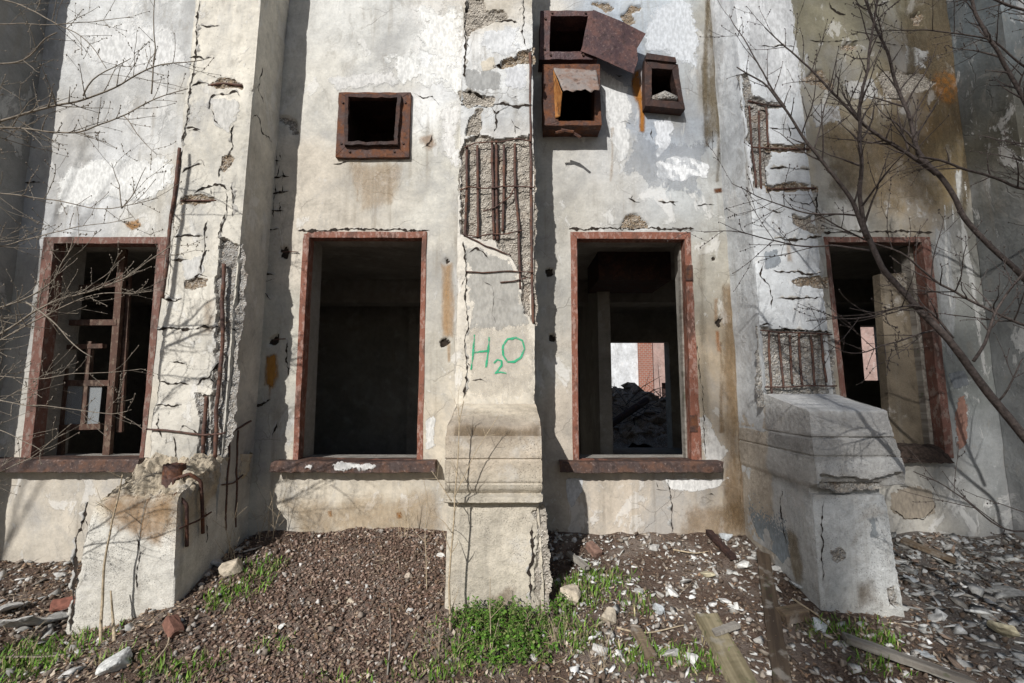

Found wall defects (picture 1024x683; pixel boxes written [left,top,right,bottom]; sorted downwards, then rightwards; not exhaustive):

crack [162,1,427,301]
spalling [328,0,538,330]
corrosion [632,71,644,131]
peeling [736,0,936,193]
spalling [182,239,248,459]
crack [462,243,495,398]
spalling [754,326,837,408]
crack [66,502,111,630]
crack [526,524,535,600]
crack [818,504,826,578]
peeling [891,486,935,520]